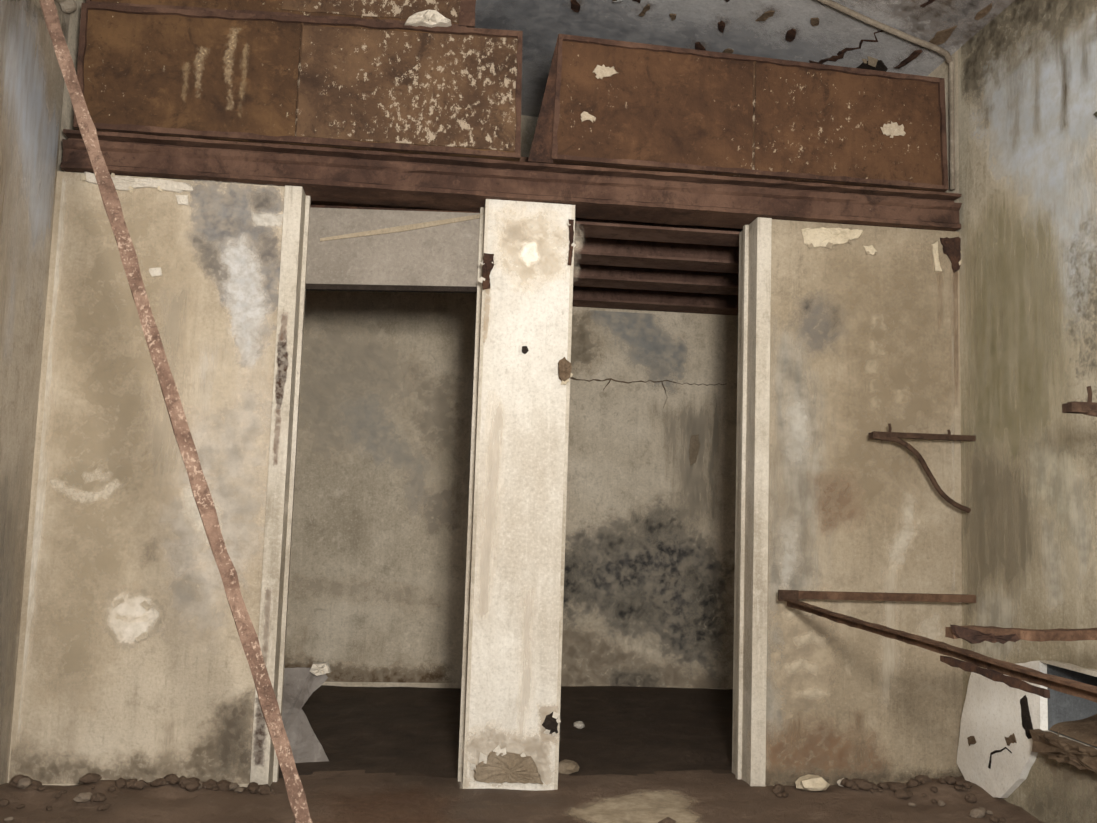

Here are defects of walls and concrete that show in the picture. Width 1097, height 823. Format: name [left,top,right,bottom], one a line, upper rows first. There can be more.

spalling [785,28,799,42]
crack [809,30,884,64]
spalling [856,23,957,71]
leakage [961,0,1097,375]
flaking render [801,227,877,256]
leakage [189,180,284,367]
leakage [0,0,224,673]
crack [570,377,725,408]
flaking render [104,590,165,647]
leakage [561,628,721,688]
leakage [9,692,254,784]
spalling [465,707,561,786]